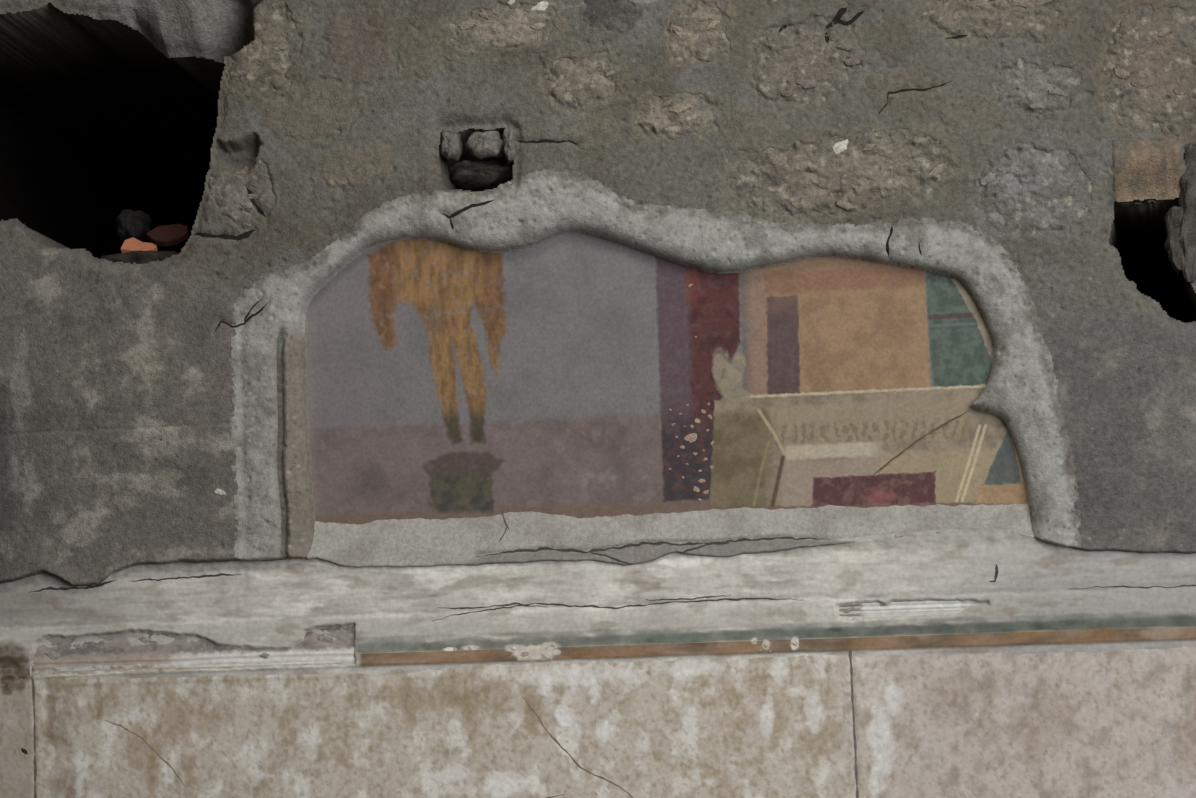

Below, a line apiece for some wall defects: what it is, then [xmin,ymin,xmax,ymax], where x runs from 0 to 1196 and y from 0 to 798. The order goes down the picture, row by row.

spalling [0,0,304,259]
spalling [1109,201,1196,323]
crack [213,299,269,334]
crack [869,410,970,478]
crack [472,510,829,565]
crack [31,573,241,592]
crack [433,595,796,621]
crack [522,696,633,798]